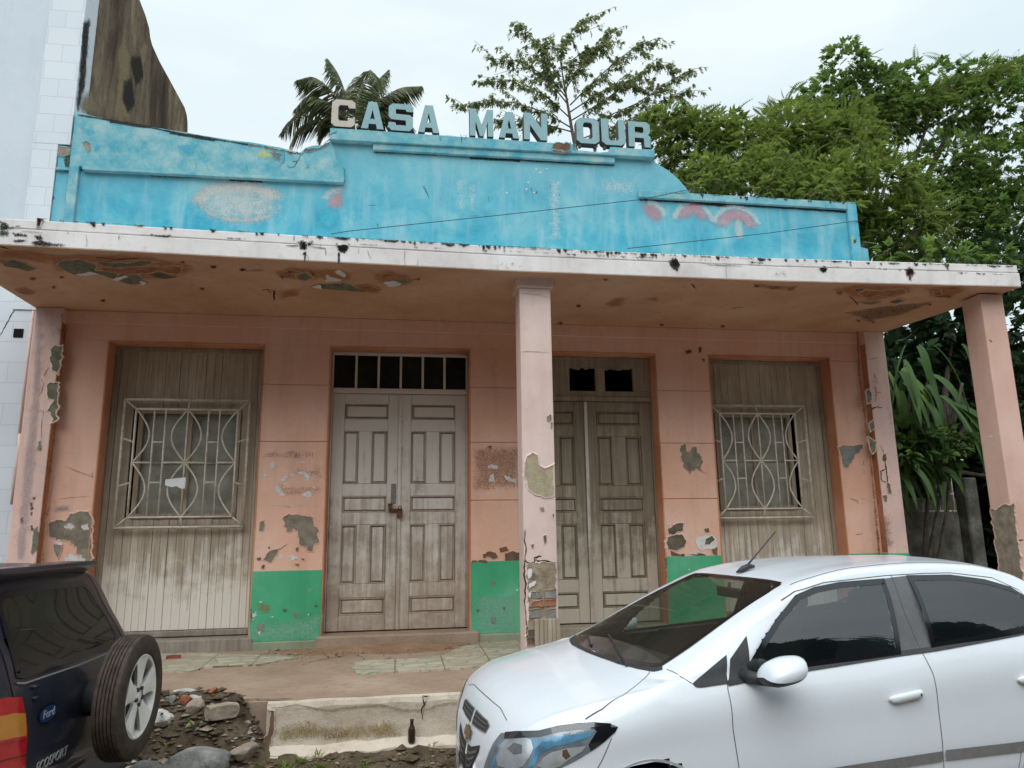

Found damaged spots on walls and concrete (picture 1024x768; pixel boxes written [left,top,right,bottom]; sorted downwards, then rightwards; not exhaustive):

spalling [0,247,194,295]
spalling [835,284,965,305]
flaking render [45,344,65,425]
flaking render [488,451,555,518]
flaking render [679,443,707,487]
flaking render [837,418,892,502]
flaking render [31,510,95,561]
flaking render [257,512,321,568]
flaking render [664,522,718,578]
flaking render [990,502,1024,581]
spalling [472,546,558,648]